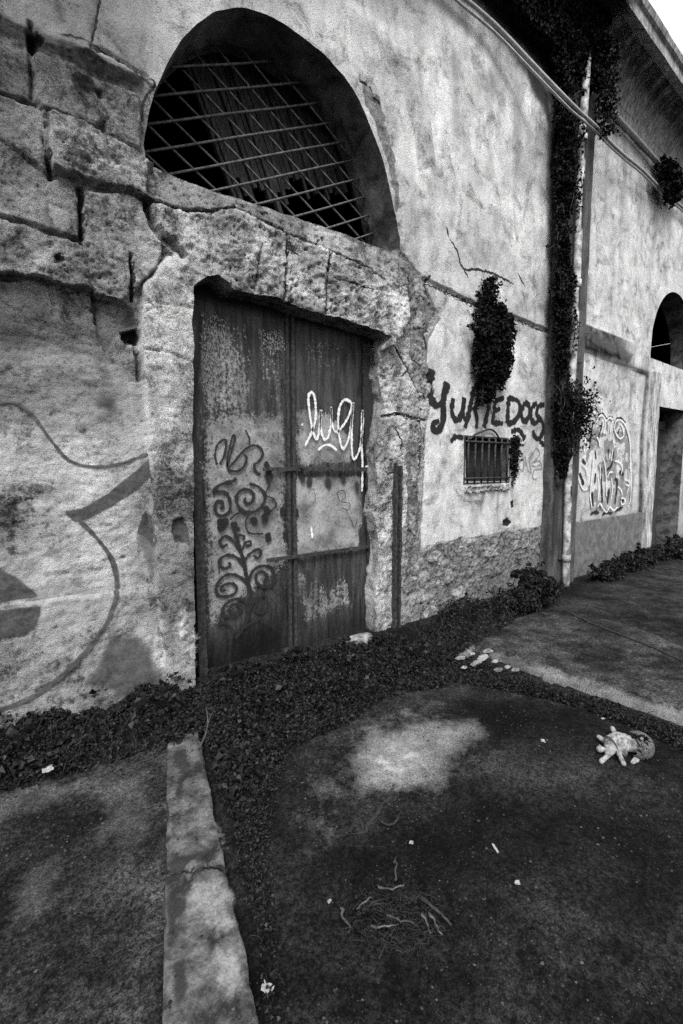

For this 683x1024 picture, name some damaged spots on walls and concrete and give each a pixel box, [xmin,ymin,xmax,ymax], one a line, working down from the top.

crack [128,256,136,302]
crack [145,201,375,314]
crack [423,228,524,307]
corrosion [325,344,373,492]
corrosion [299,471,312,488]
flaking render [405,440,541,618]
crack [182,840,235,877]